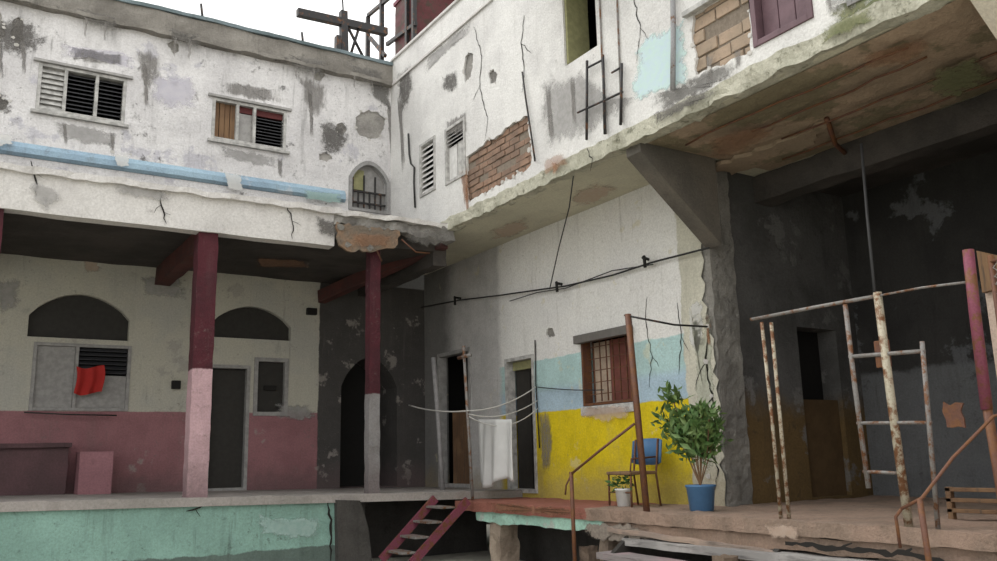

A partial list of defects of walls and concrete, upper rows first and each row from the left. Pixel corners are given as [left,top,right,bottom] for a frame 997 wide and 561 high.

spalling [0,14,24,46]
leakage [824,0,871,42]
crack [472,30,488,141]
flaking render [467,116,532,201]
spalling [335,222,430,262]
crack [645,299,713,403]